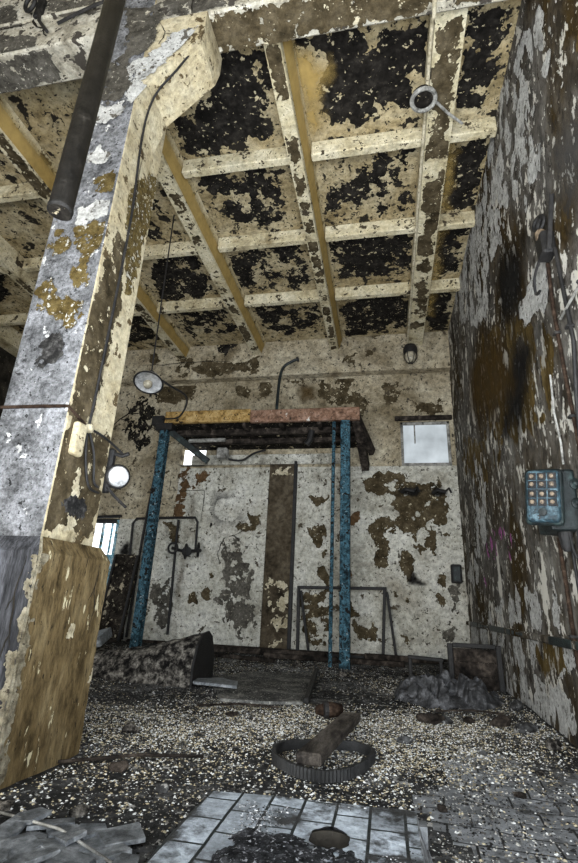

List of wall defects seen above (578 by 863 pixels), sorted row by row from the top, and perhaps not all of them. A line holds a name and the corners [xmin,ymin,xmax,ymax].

peeling [0,5,62,94]
peeling [45,0,96,17]
peeling [0,134,50,199]
peeling [0,144,273,540]
peeling [96,0,555,648]
leakage [504,344,531,433]
spalling [0,553,49,785]